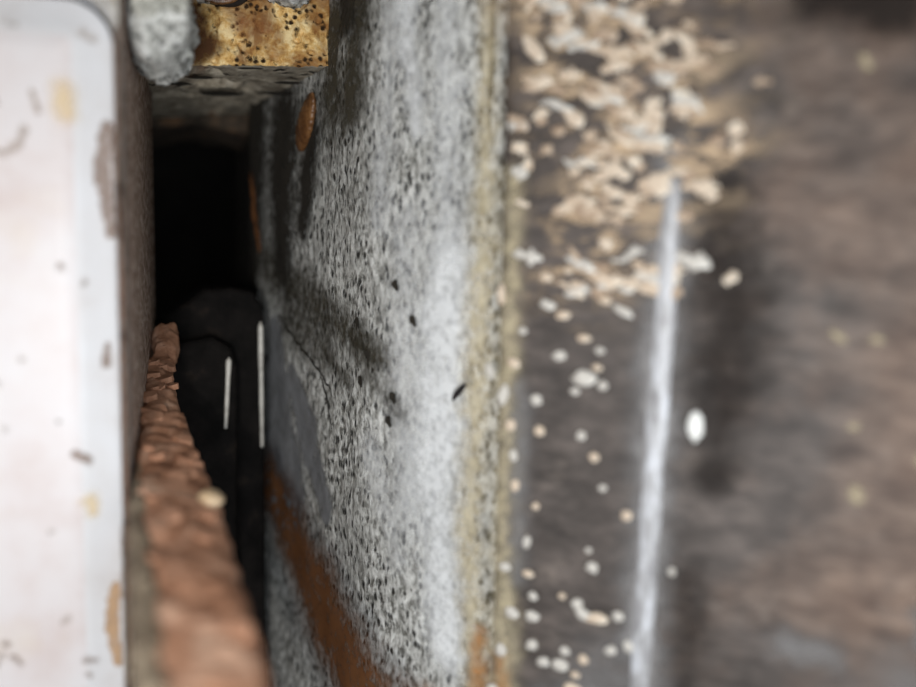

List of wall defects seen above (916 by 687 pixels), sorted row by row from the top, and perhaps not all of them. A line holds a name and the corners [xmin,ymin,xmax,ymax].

rust [192,4,221,69]
leakage [539,299,571,320]
leakage [699,178,753,442]
rust [102,28,270,687]
crack [277,315,332,429]
leakage [238,0,545,687]
leakage [552,350,567,361]
leakage [570,334,608,395]
rust [264,458,391,687]
leakage [585,547,599,574]
leakage [558,592,624,625]
leakage [526,639,609,687]